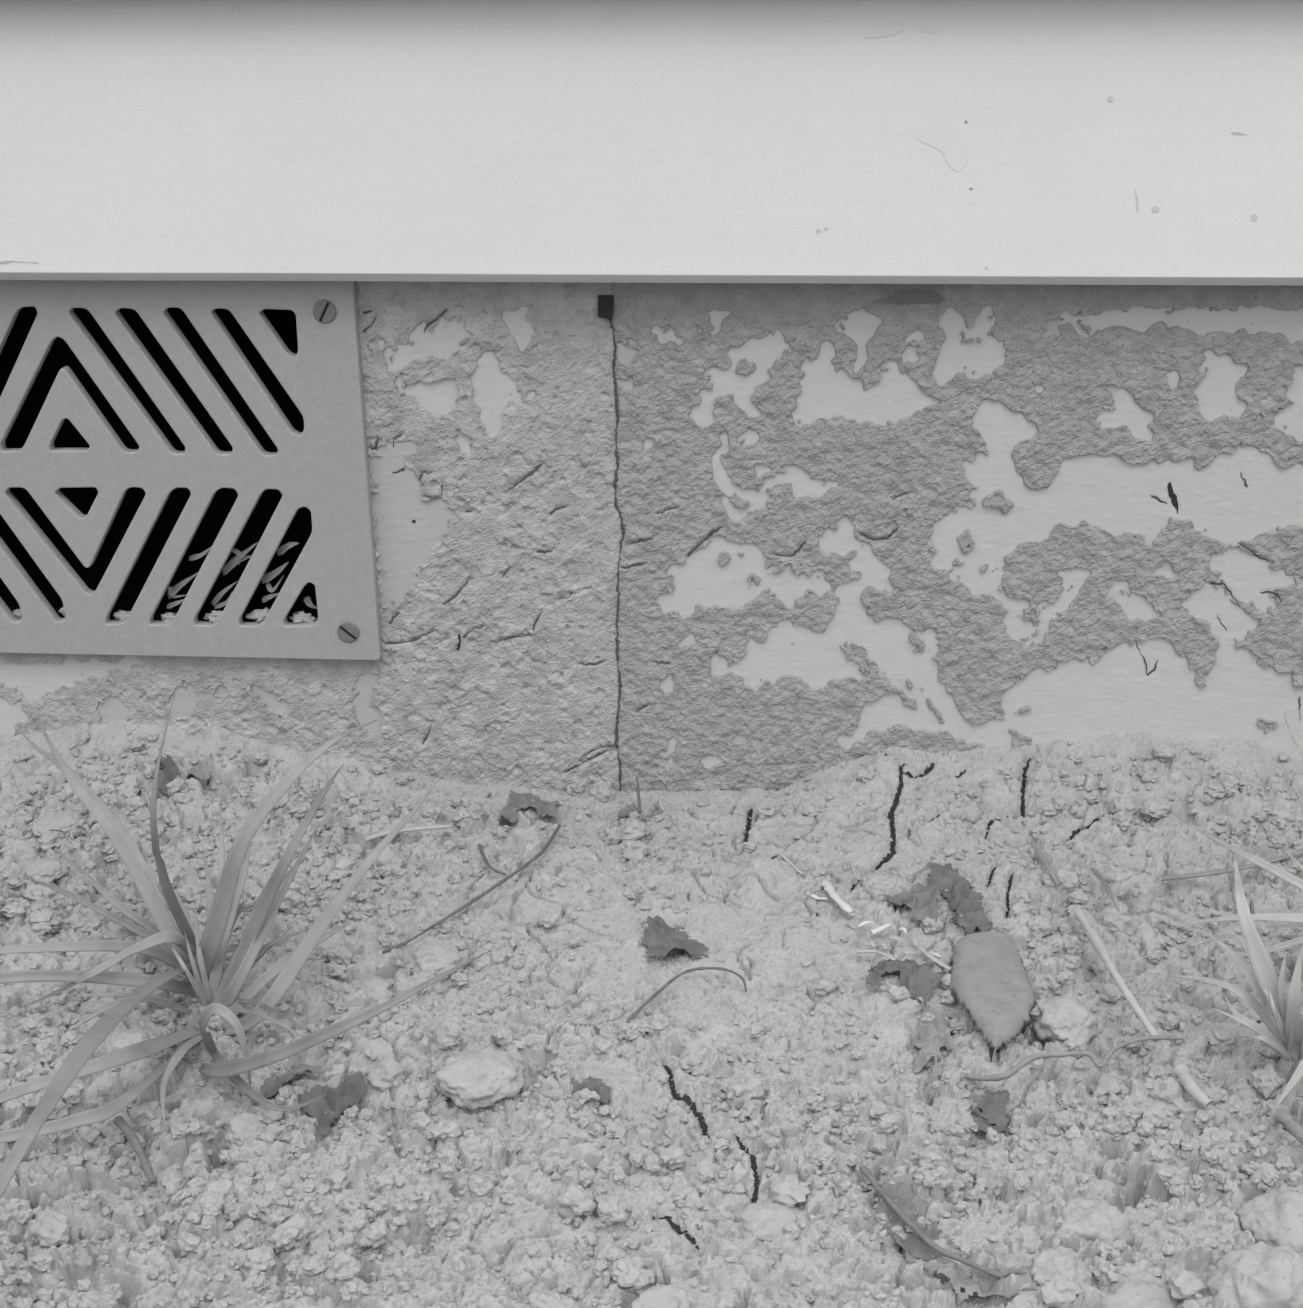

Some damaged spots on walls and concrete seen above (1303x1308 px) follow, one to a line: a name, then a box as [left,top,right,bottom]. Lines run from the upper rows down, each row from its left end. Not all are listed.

spalling [597,295,614,323]
spalling [373,306,537,437]
spalling [614,337,639,390]
spalling [368,440,470,614]
crack [371,320,677,791]
crack [688,527,723,557]
spalling [648,305,1303,763]
spalling [0,656,144,735]
spalling [352,673,382,734]
spalling [700,755,724,768]